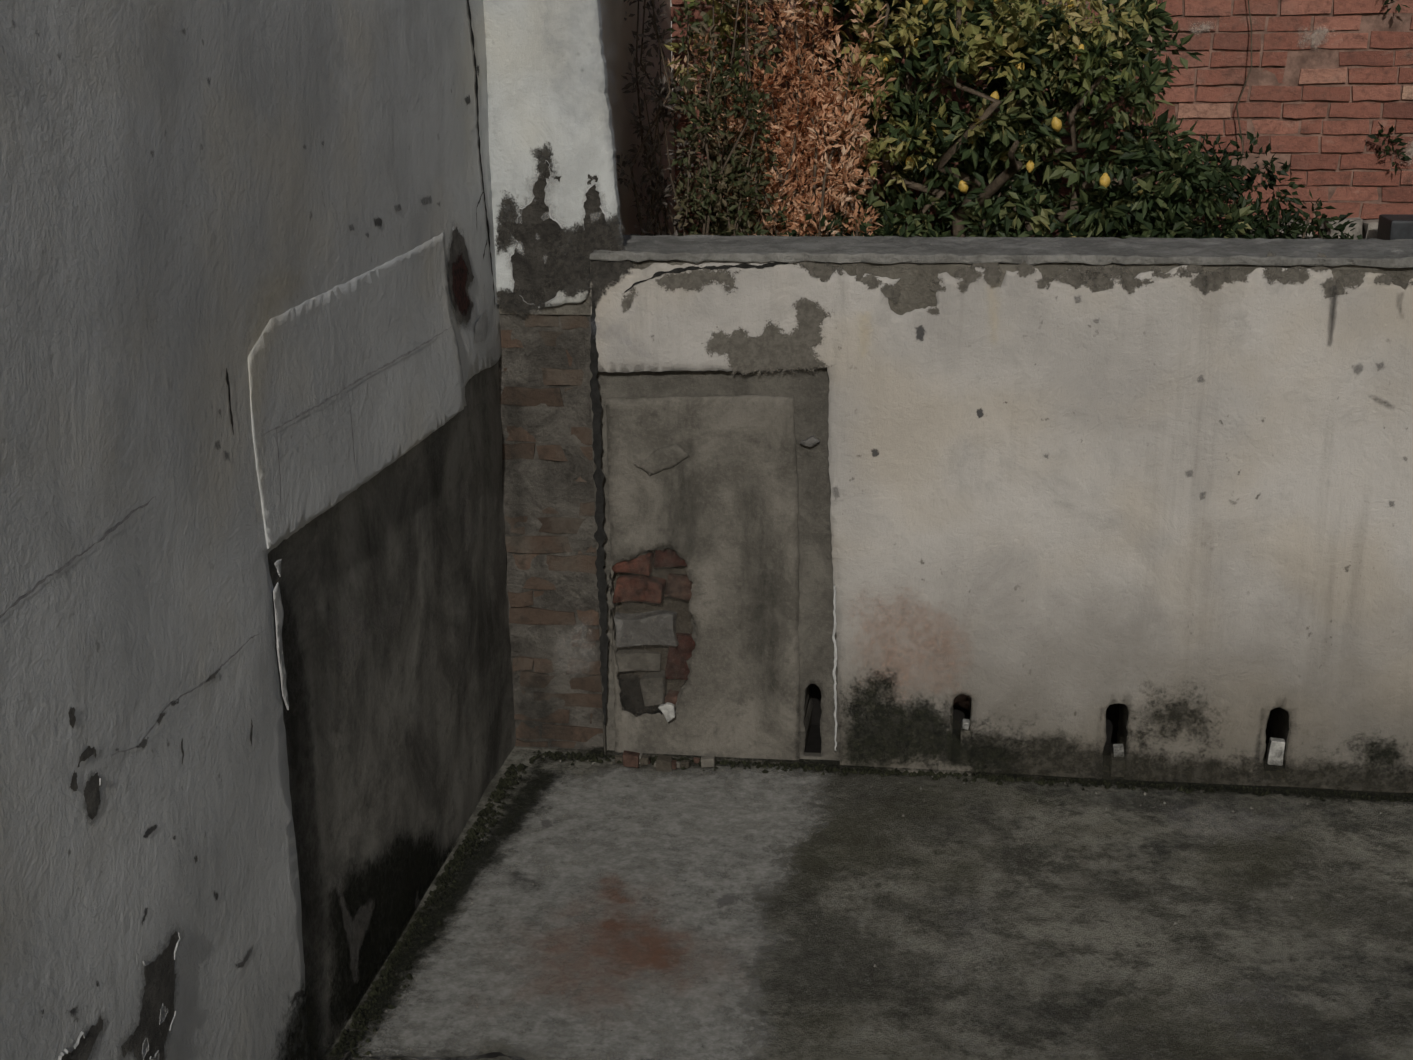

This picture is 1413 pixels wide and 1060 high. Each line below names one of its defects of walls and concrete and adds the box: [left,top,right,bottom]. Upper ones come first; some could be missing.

crack [464,0,495,303]
spalling [448,142,635,343]
peeling [706,297,833,375]
peeling [800,261,901,304]
peeling [916,250,1413,341]
crack [0,497,154,618]
crack [111,630,264,755]
spalling [611,548,696,716]
damp [280,589,324,1037]
damp [959,723,1413,797]
peeling [121,931,180,1060]
crack [352,1052,525,1060]